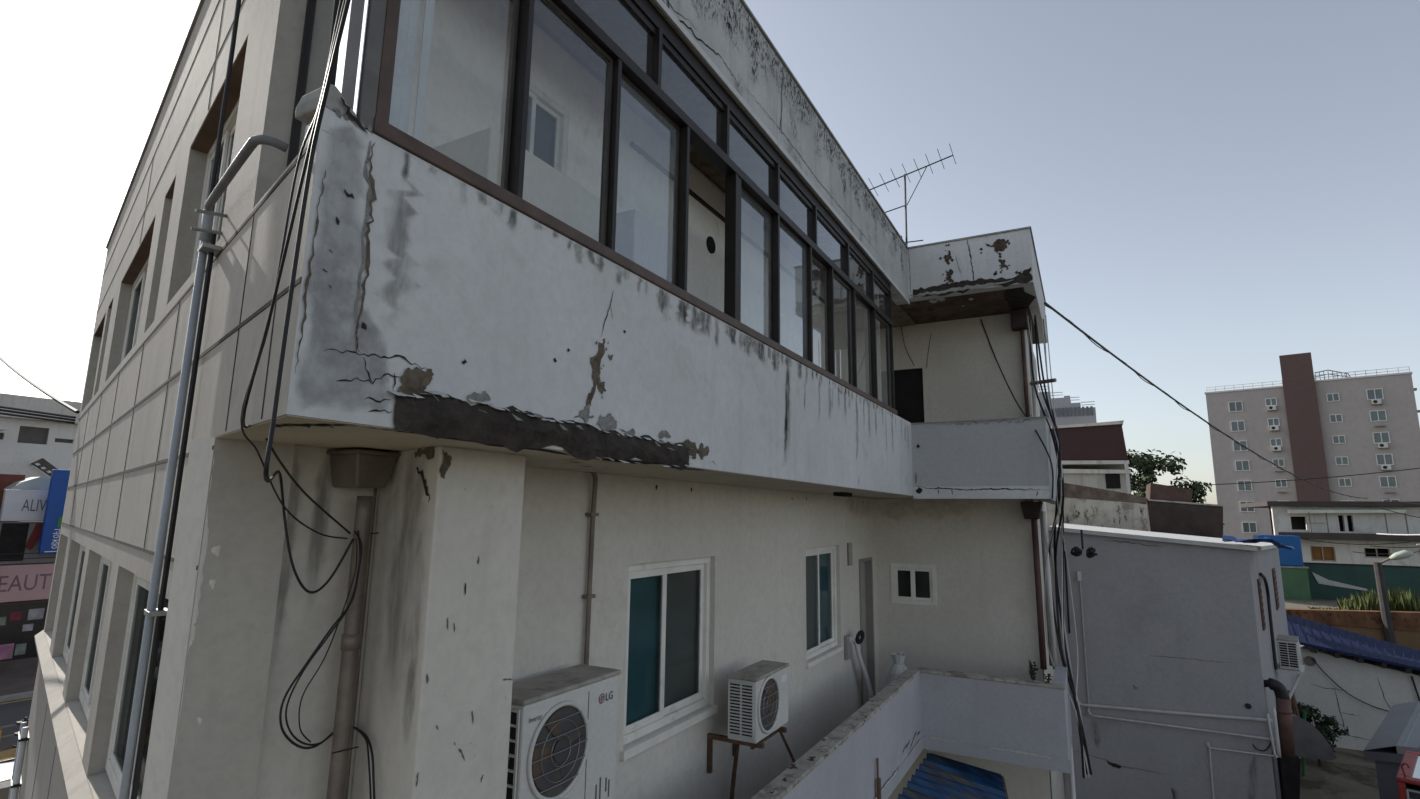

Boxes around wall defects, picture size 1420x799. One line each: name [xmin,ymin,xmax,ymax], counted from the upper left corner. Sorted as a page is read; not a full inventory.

leakage [697,0,904,270]
spalling [388,338,716,479]
leakage [683,307,813,380]
spalling [908,237,1036,320]